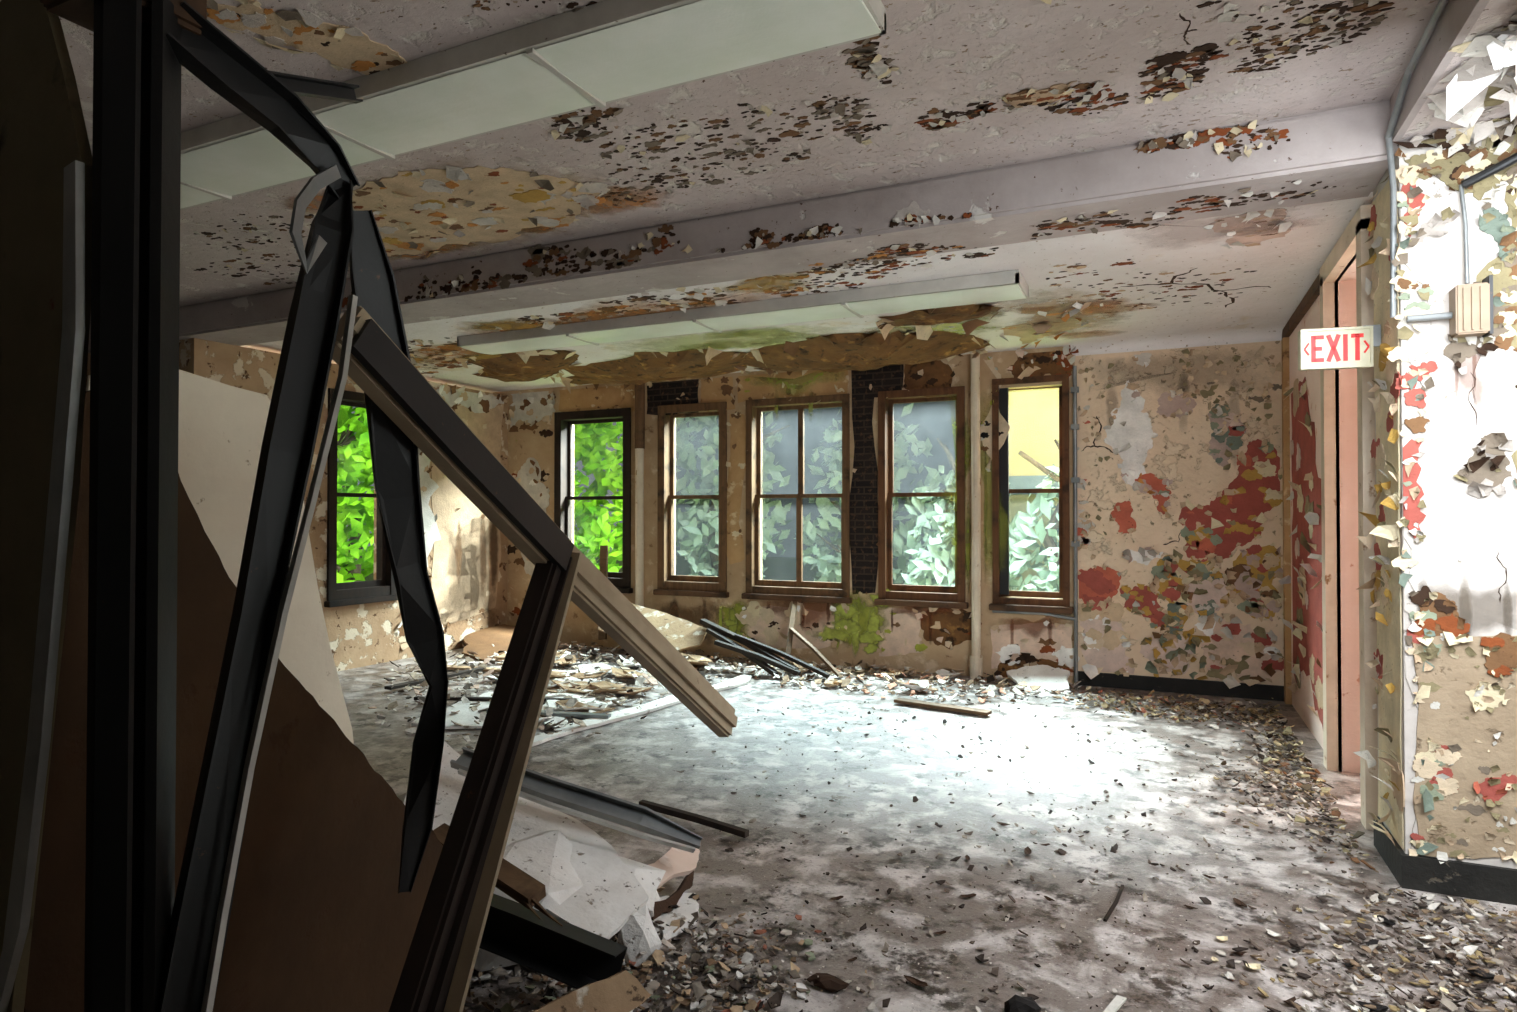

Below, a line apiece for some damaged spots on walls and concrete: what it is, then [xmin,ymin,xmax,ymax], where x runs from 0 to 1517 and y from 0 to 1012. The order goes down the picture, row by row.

peeling [207,0,407,76]
peeling [193,214,314,285]
peeling [352,0,1517,1012]